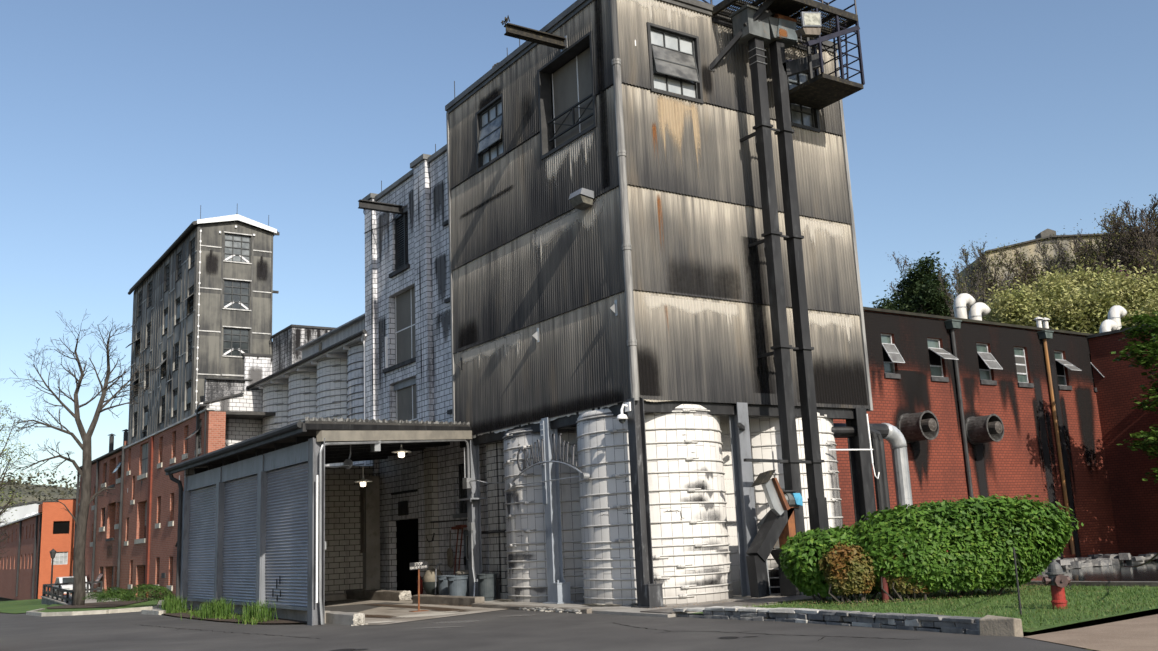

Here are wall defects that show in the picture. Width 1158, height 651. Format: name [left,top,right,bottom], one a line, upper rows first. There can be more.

water stain [409,182,444,230]
water stain [532,0,610,255]
water stain [637,351,660,396]
water stain [646,236,774,394]
water stain [808,311,1097,559]